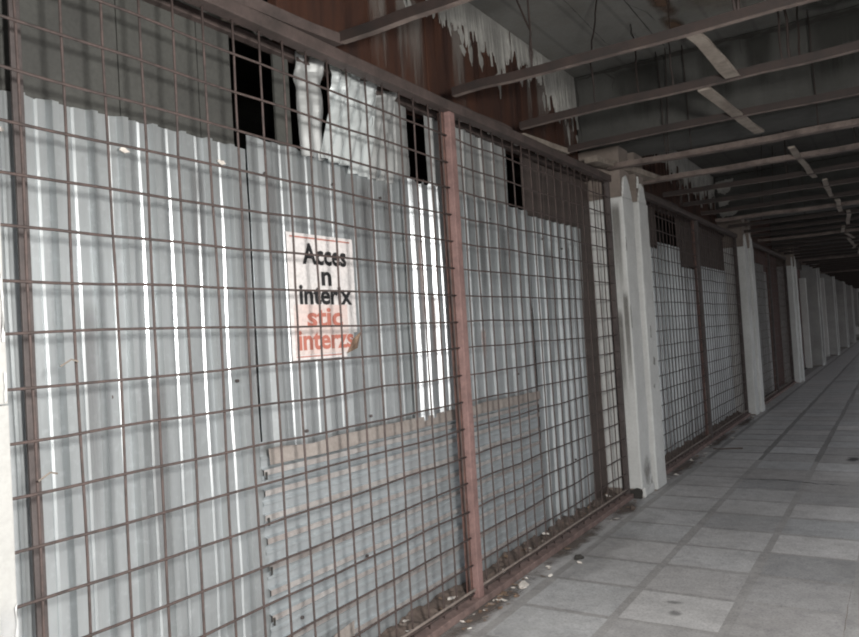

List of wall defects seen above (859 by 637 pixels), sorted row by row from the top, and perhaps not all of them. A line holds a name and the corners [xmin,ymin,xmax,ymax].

corrosion [471,33,486,80]
peeling [426,2,579,144]